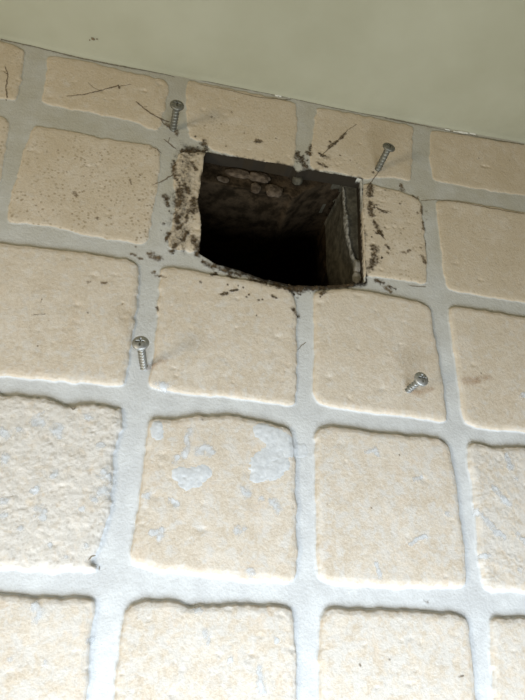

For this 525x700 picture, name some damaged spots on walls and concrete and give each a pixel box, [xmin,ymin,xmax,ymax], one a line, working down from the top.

spalling [172,428,215,491]
spalling [248,423,308,483]